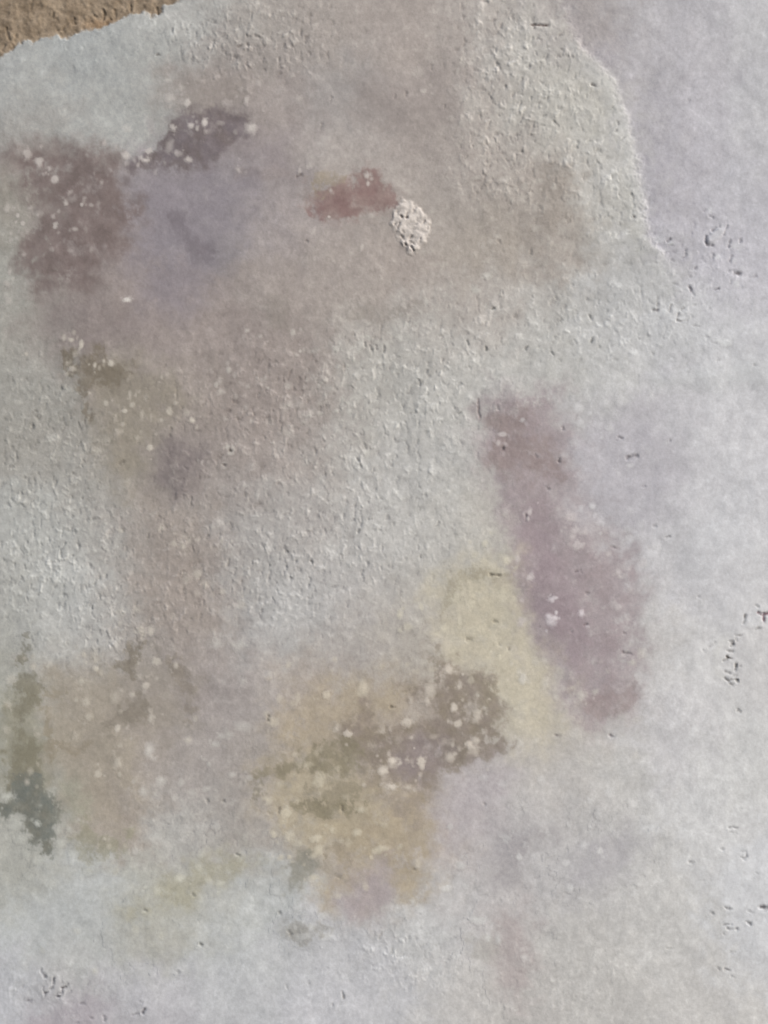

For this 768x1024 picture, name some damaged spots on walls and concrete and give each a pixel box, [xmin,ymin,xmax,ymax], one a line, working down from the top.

spalling [0,0,181,60]
damp [0,41,306,352]
corrosion [293,157,416,235]
damp [389,196,432,256]
damp [32,422,267,839]
damp [233,358,713,1024]